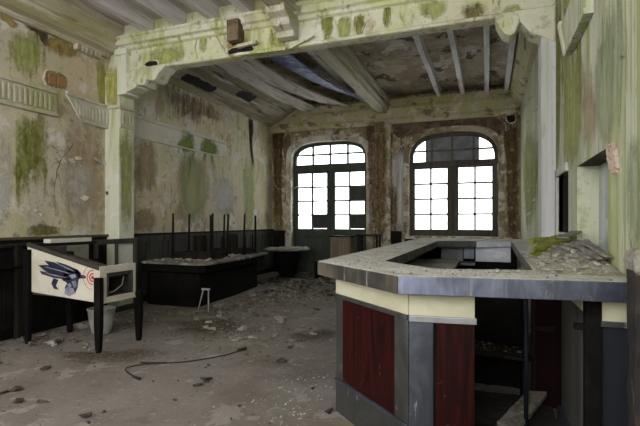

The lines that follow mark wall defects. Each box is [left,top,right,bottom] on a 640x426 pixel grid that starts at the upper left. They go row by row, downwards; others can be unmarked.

damp [10,25,48,67]
spalling [42,69,69,91]
spalling [606,141,620,175]
crack [52,144,73,216]